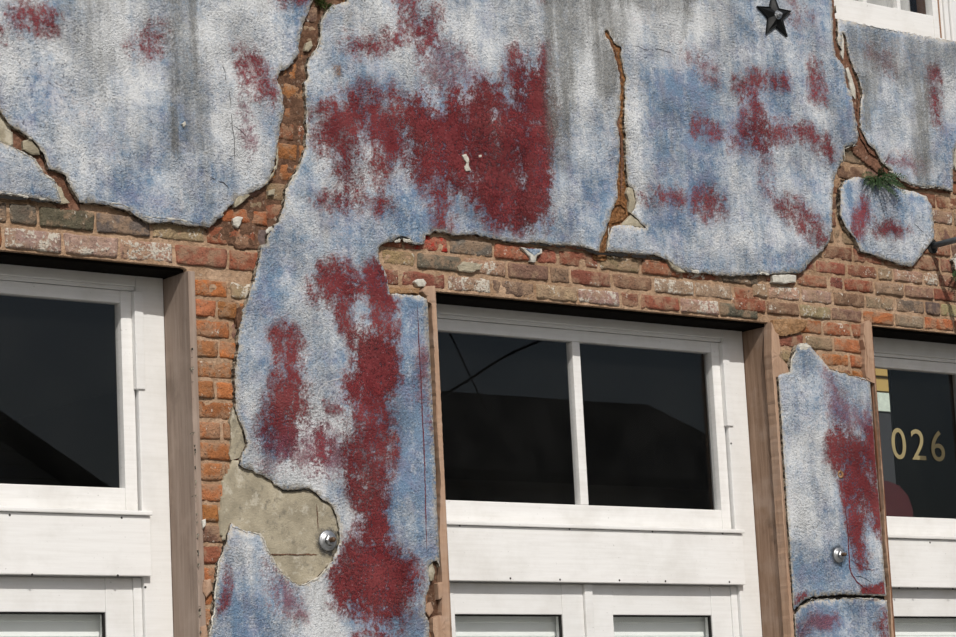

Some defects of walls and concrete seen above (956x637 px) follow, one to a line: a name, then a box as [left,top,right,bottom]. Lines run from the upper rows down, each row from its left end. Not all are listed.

flaking render [0,116,13,146]
peeling [233,45,279,150]
peeling [308,0,558,238]
crack [592,31,671,261]
peeling [925,63,943,126]
flaking render [0,145,956,637]
crack [794,498,886,613]